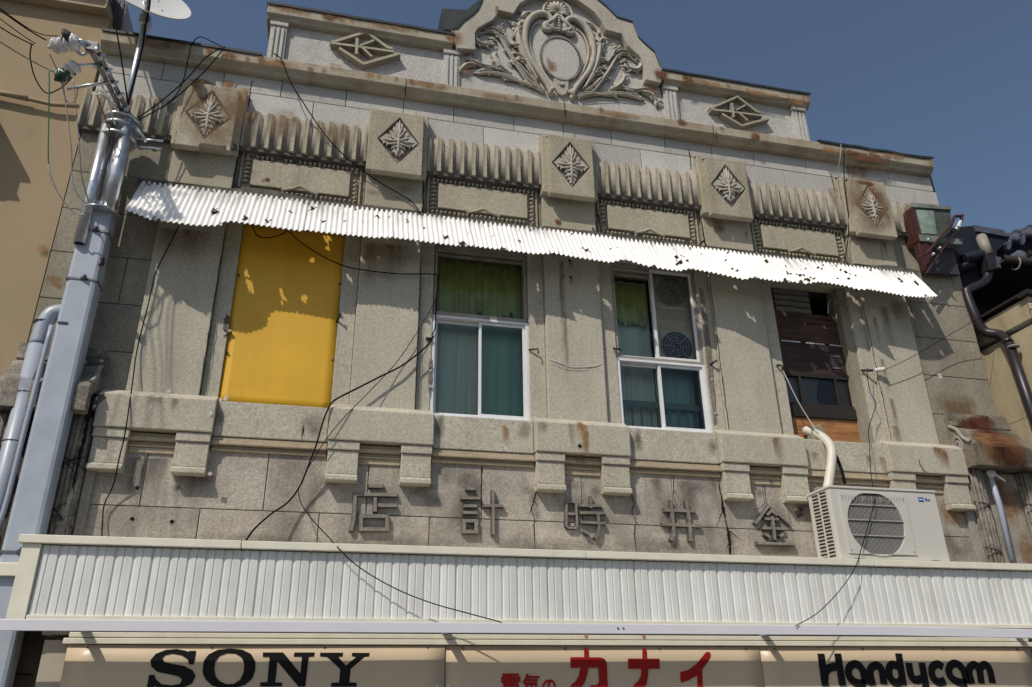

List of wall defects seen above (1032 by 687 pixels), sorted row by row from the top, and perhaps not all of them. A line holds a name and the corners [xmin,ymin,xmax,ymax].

rust [946,400,1024,466]
crack [718,478,737,555]